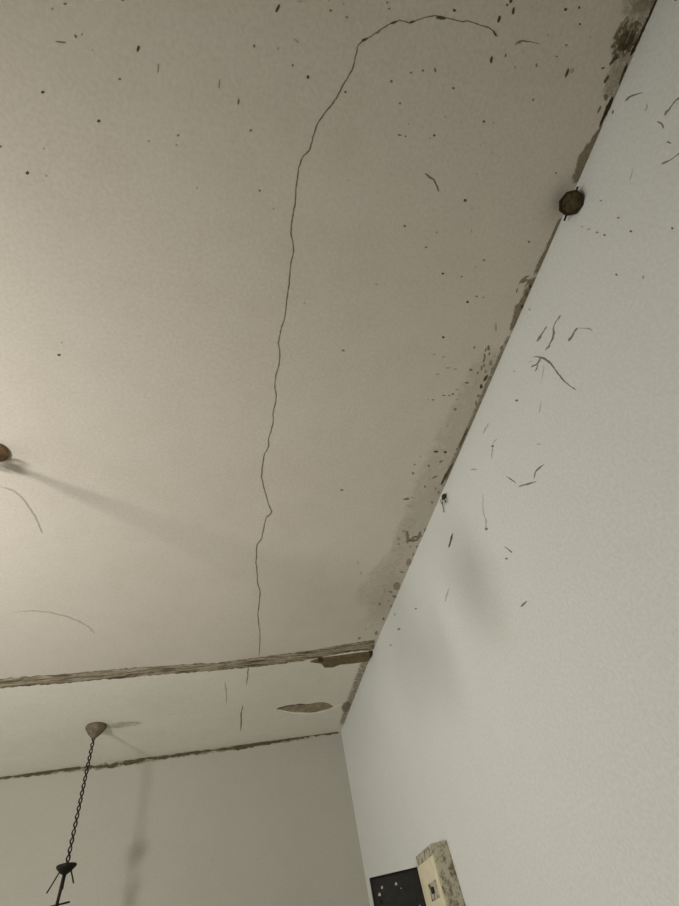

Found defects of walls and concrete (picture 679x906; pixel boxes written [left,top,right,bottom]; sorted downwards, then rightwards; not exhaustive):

damp [601,16,646,83]
crack [0,15,543,780]
damp [445,338,509,480]
peeling [277,702,343,715]